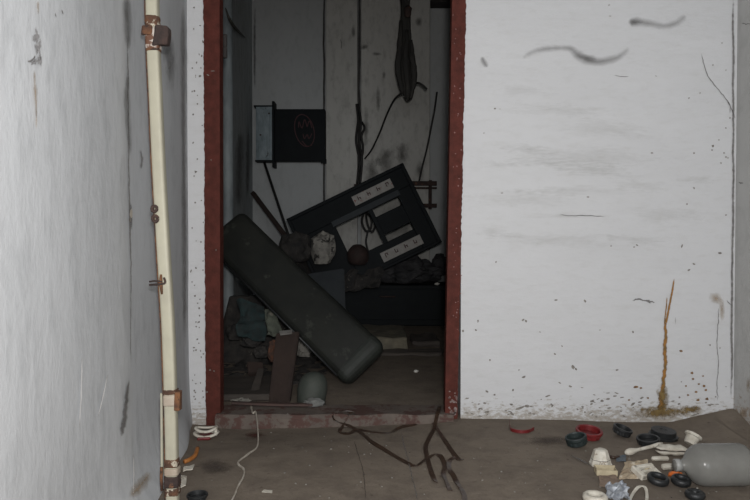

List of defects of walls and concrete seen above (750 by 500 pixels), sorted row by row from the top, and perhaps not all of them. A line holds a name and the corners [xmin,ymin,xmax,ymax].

crack [702,14,748,395]
spalling [577,392,644,418]
corrosion [640,281,709,418]